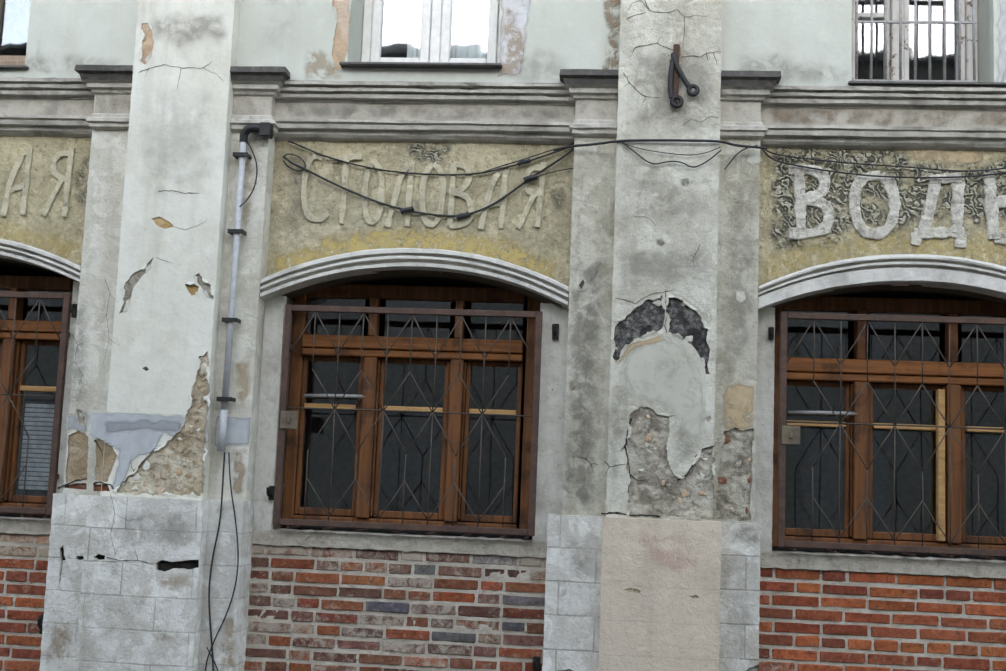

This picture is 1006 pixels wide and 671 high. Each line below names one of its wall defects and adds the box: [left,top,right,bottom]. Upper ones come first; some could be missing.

peeling [139,22,154,64]
crack [139,62,224,88]
peeling [331,0,352,71]
crack [623,0,717,107]
peeling [152,216,173,229]
peeling [119,258,153,314]
peeling [185,273,215,299]
peeling [611,294,711,374]
spalling [64,351,212,498]
spalling [626,406,754,521]
crack [58,434,176,565]